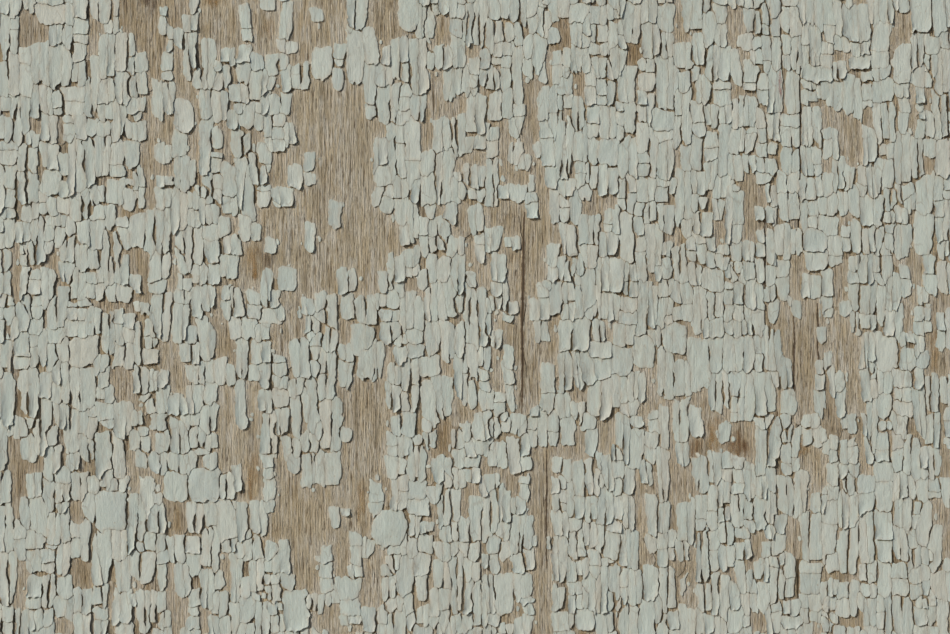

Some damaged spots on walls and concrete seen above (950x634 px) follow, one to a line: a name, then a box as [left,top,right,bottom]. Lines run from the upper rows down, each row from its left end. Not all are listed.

crack [0,0,332,634]
peeling [0,0,431,634]
crack [334,58,343,66]
crack [364,0,950,634]
peeling [404,0,950,634]